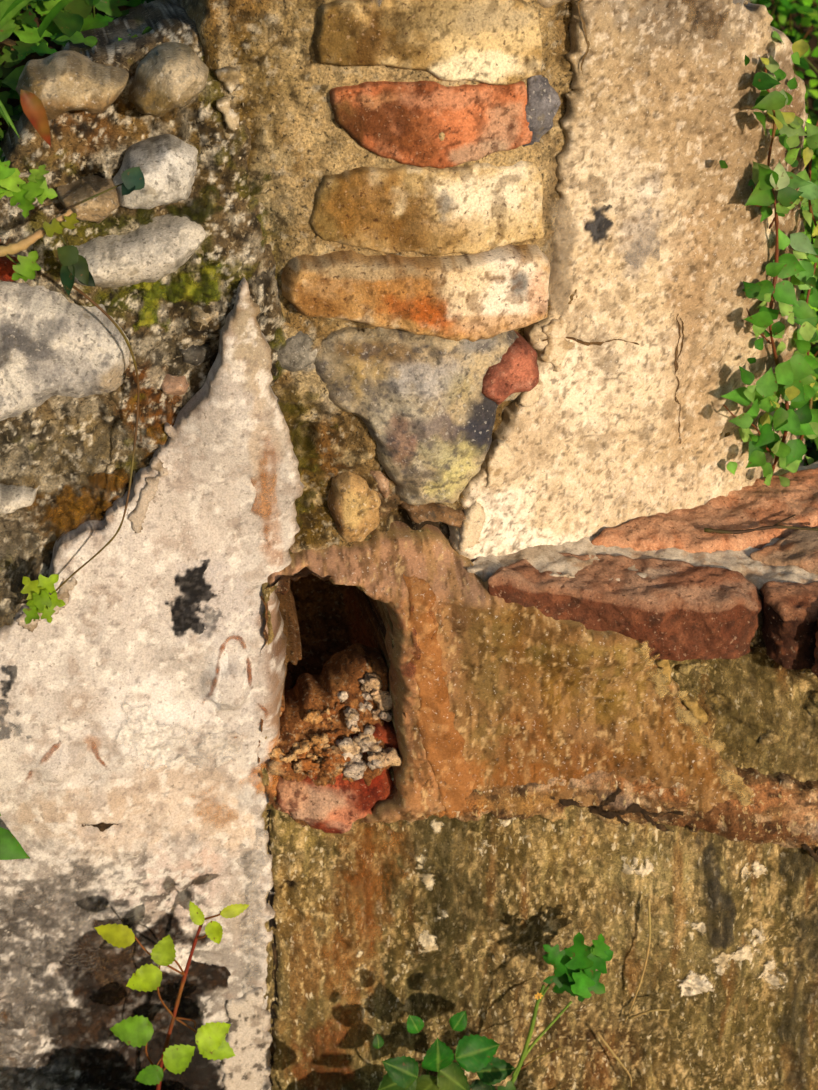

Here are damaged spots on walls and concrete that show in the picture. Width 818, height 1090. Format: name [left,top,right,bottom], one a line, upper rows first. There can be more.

crack [542,337,639,346]
crack [674,314,684,444]
water stain [165,560,217,637]
peeling [116,703,243,769]
spalling [258,567,406,834]
water stain [0,862,231,1090]